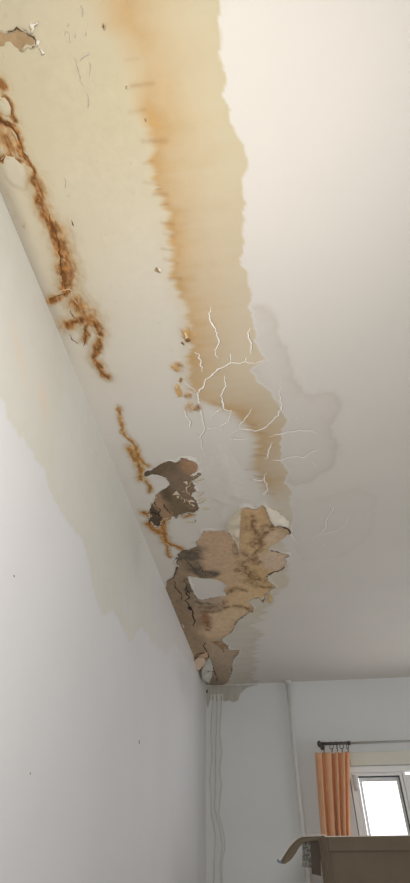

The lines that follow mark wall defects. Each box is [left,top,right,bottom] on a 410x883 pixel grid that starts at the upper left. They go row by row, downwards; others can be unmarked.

peeling [0,21,44,55]
corrosion [0,0,202,561]
damp [10,0,385,561]
crack [184,308,319,495]
peeling [141,456,292,685]